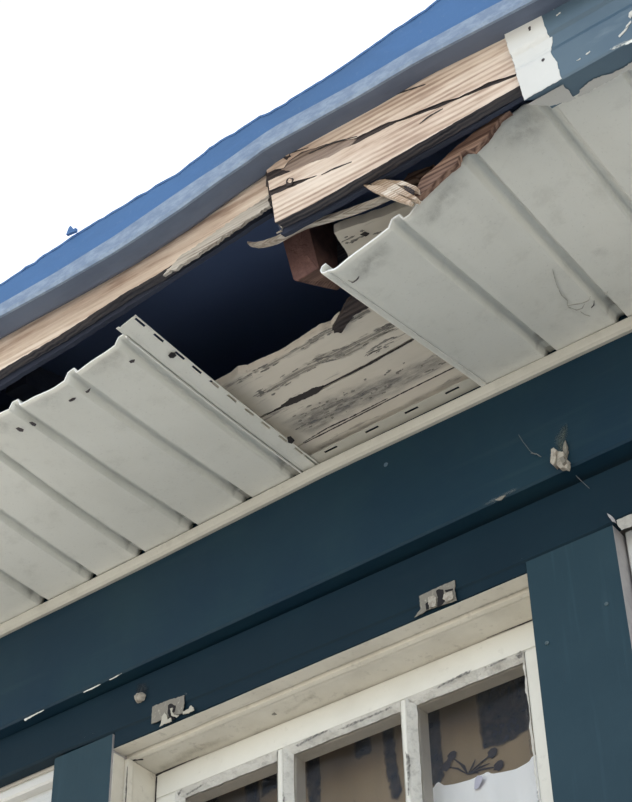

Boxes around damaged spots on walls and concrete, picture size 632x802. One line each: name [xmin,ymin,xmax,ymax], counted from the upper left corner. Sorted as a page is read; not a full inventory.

peeling [504,16,632,106]
crack [266,75,516,200]
peeling [237,328,333,384]
peeling [253,323,399,397]
peeling [415,580,457,617]
peeling [151,695,194,726]